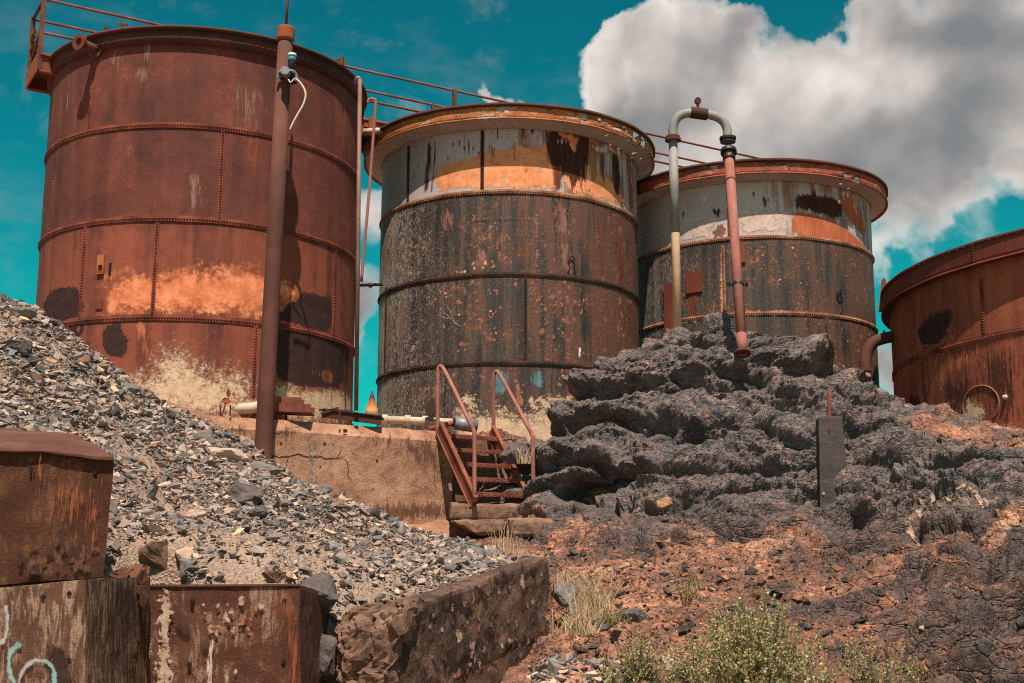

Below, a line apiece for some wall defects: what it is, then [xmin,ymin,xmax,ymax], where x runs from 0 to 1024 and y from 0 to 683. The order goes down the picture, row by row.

corrosion [424,141,436,191]
peeling [434,143,626,205]
peeling [558,132,579,152]
corrosion [513,129,633,274]
peeling [682,217,726,241]
peeling [740,208,789,234]
corrosion [792,194,866,249]
corrosion [103,262,264,369]
leakage [128,340,257,433]
leakage [275,383,351,437]
crack [272,425,363,479]
corrosion [283,592,298,683]